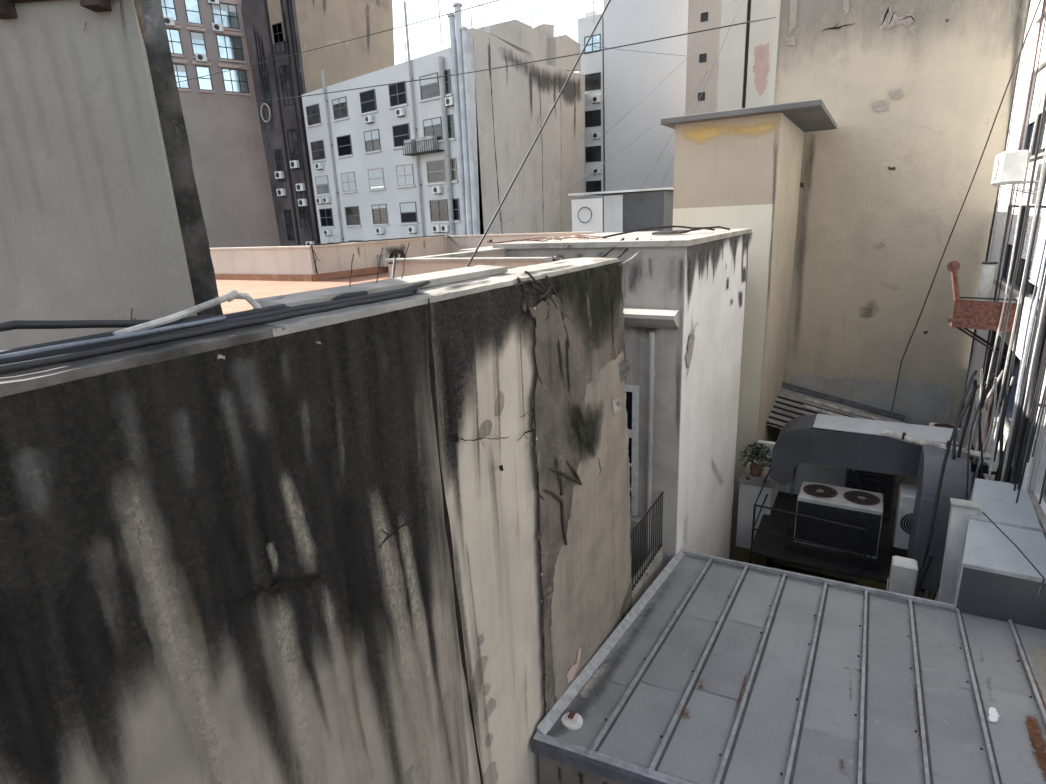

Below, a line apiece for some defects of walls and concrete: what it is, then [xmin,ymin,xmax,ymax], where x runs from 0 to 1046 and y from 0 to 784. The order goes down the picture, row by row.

damp [505,55,580,127]
peeling [753,42,770,96]
damp [780,0,965,35]
damp [994,0,1028,105]
damp [680,233,752,306]
damp [0,254,641,784]
rust [1017,649,1046,778]